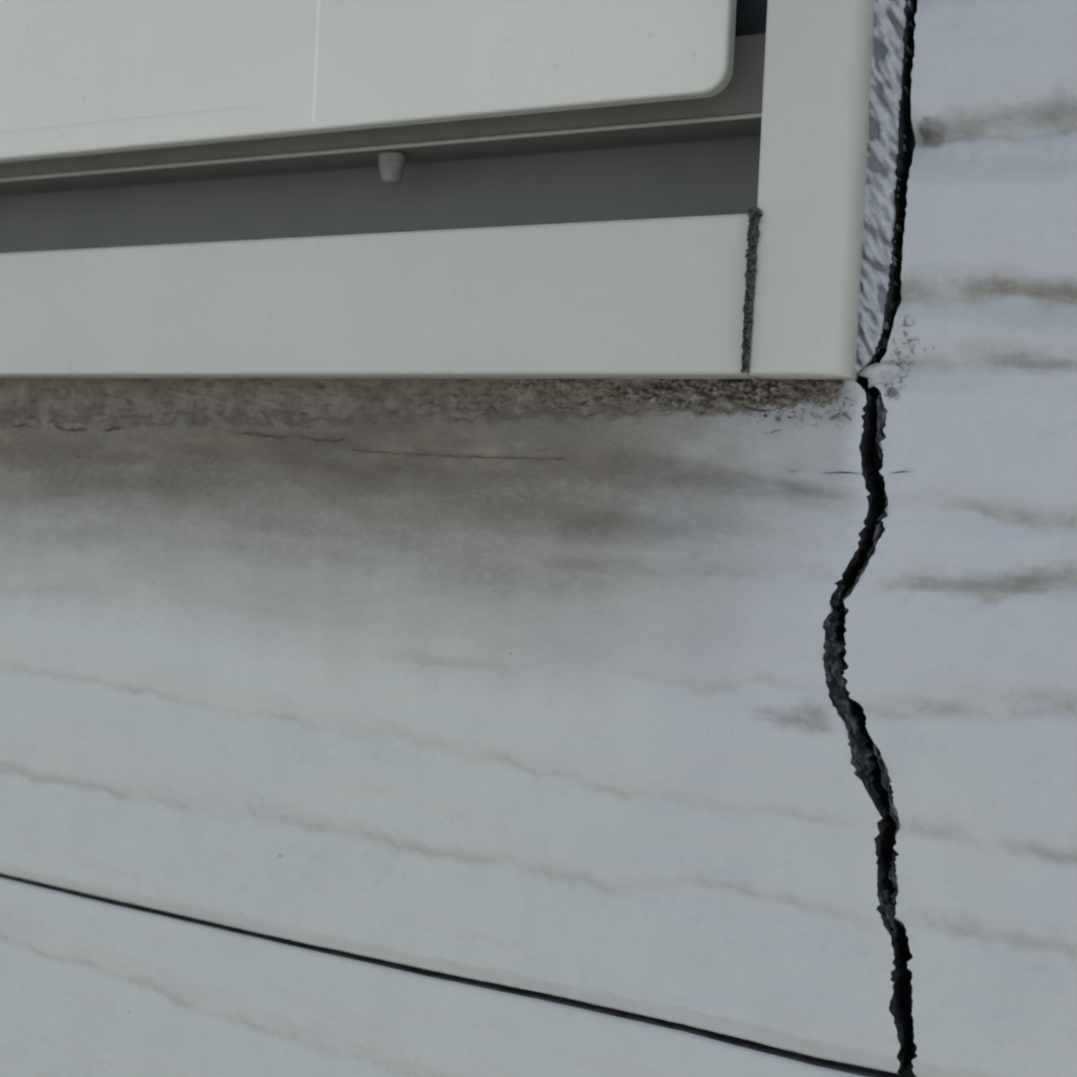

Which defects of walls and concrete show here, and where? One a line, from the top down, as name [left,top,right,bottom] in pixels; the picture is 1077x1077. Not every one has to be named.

crack [12,423,125,431]
water stain [0,385,696,531]
crack [231,432,571,460]
crack [573,0,918,1077]